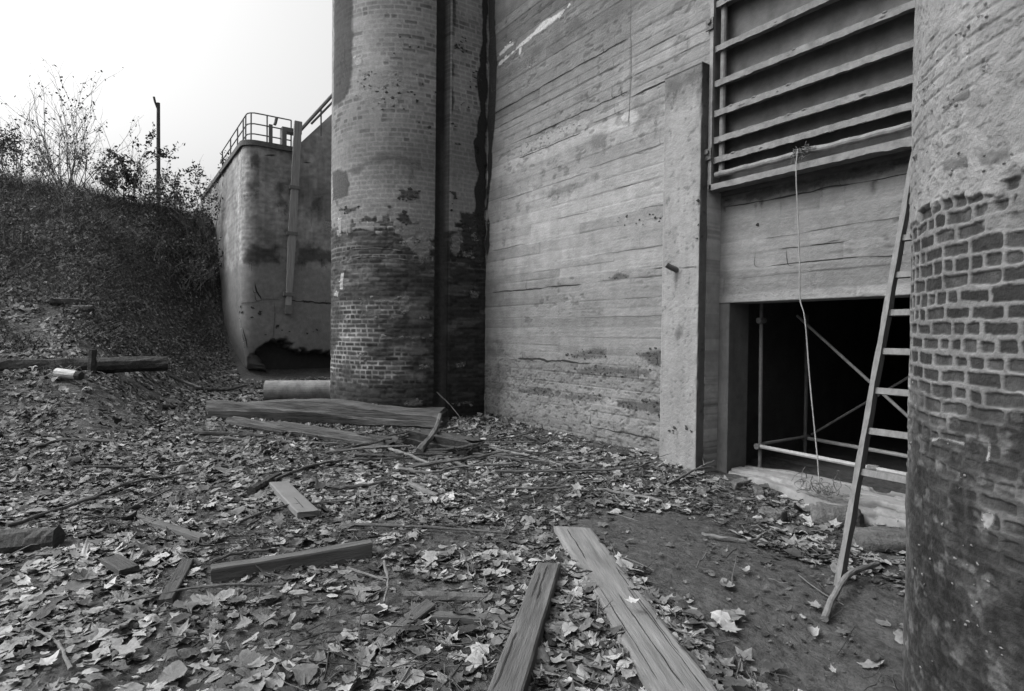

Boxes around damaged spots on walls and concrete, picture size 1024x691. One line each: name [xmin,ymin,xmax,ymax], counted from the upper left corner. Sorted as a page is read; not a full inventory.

spalling [337,205,360,233]
peeling [396,187,431,264]
crack [493,239,696,318]
crack [517,356,589,364]